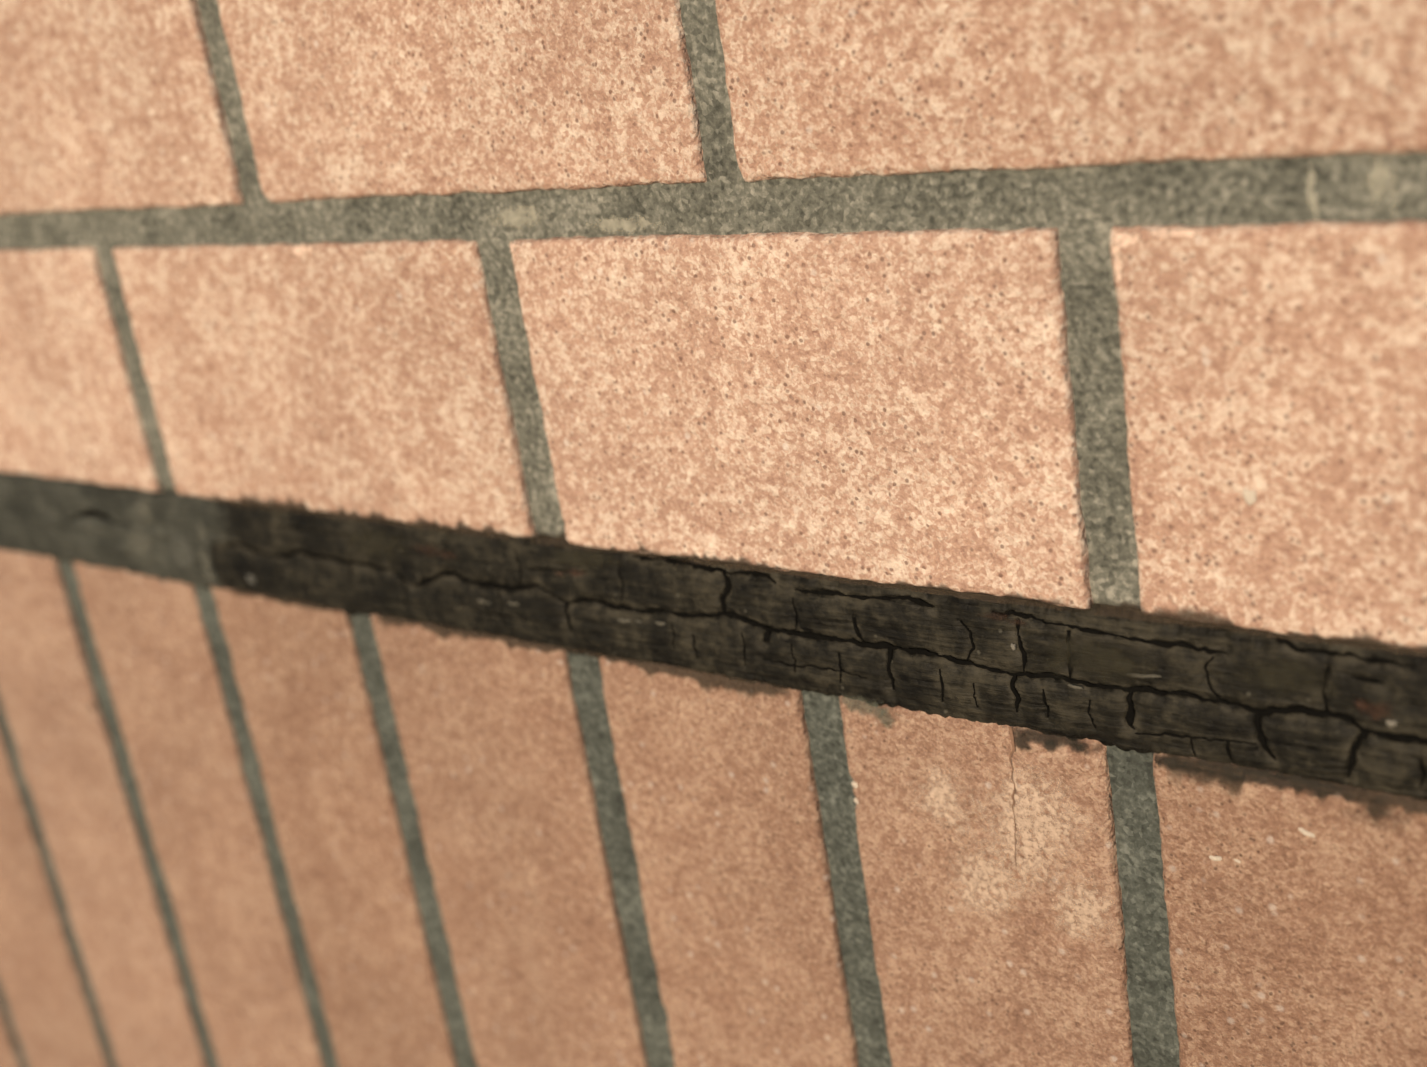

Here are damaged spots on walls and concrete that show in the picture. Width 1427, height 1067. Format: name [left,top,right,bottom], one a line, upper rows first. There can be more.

crack [223,529,1427,867]